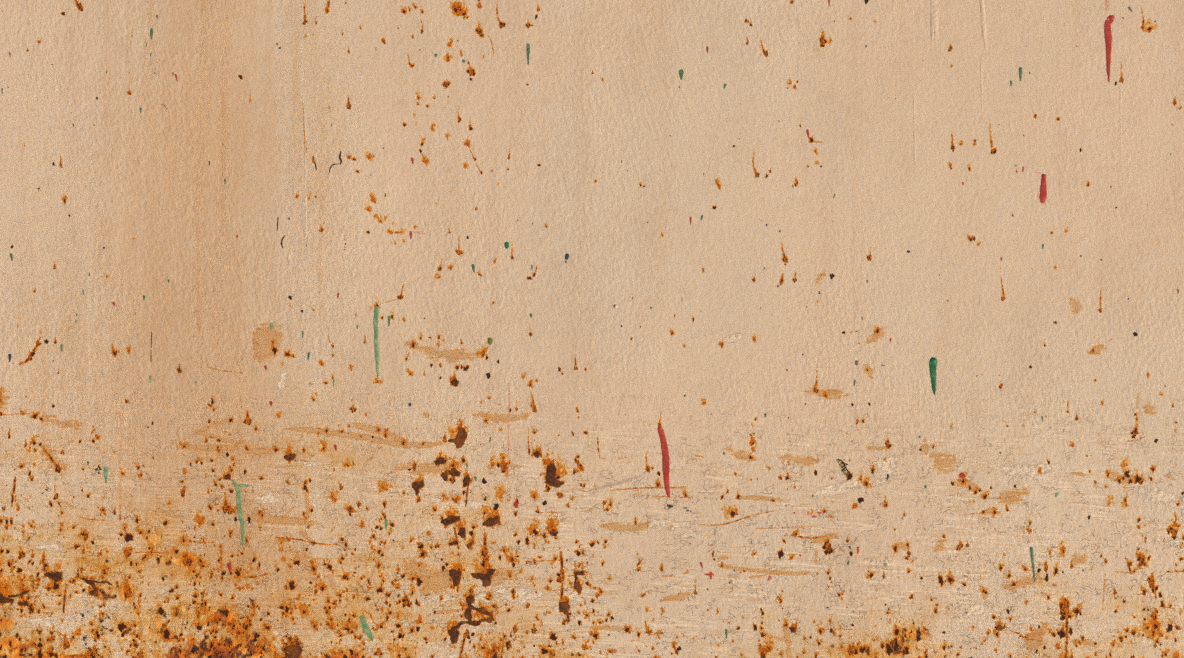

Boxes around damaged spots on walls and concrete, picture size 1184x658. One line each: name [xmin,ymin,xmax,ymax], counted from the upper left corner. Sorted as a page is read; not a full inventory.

rust [451,0,494,56]
rust [446,39,475,81]
rust [480,375,538,431]